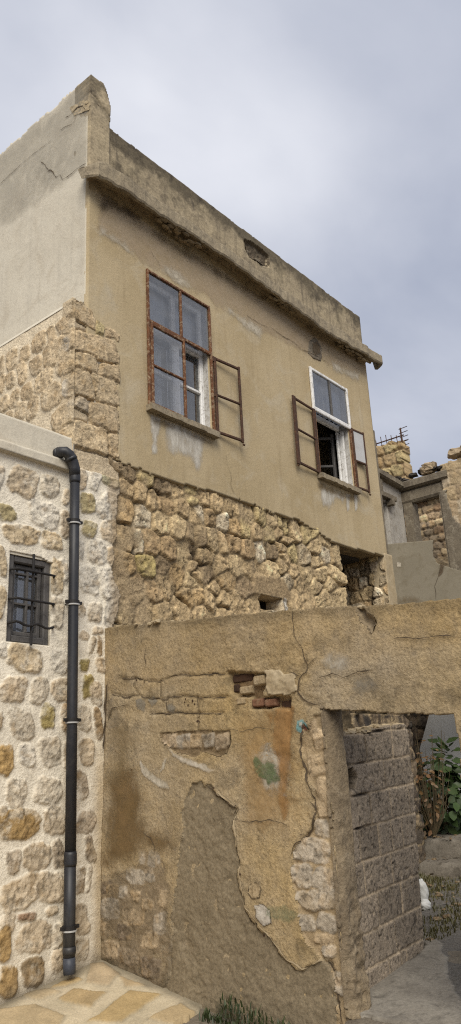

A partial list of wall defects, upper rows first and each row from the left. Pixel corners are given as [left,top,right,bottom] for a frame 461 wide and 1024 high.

crack [0,103,99,184]
peeling [99,198,369,379]
water stain [151,416,203,468]
water stain [105,771,168,863]
spalling [100,698,346,1024]
crack [209,612,375,858]